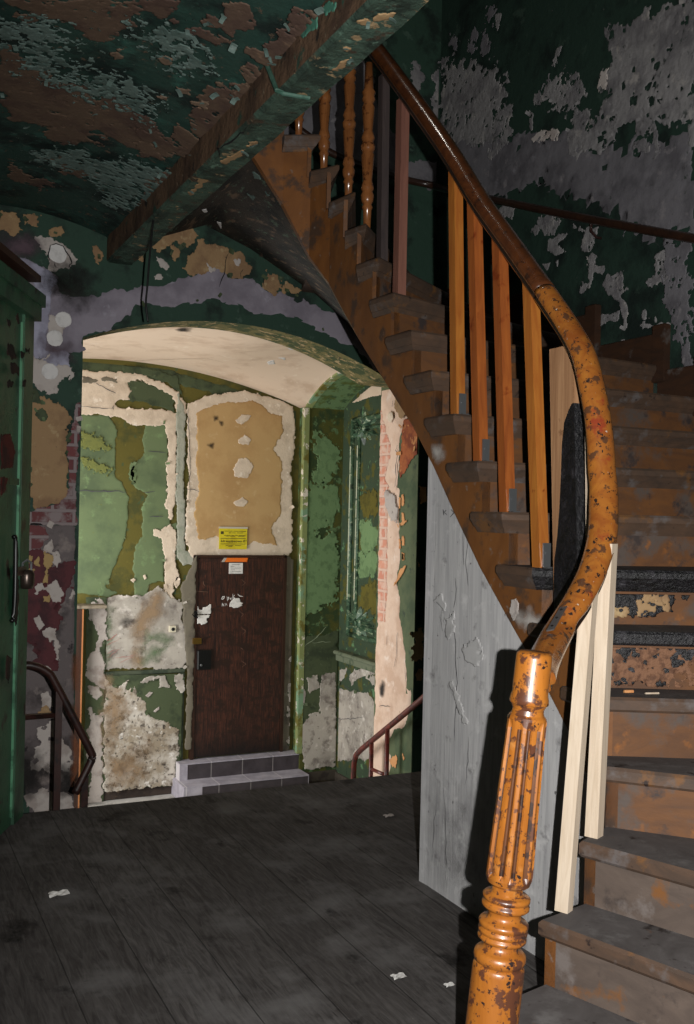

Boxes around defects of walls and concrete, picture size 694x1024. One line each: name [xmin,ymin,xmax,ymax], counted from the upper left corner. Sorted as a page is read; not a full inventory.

peeling [0,0,338,212]
peeling [410,0,694,367]
peeling [0,210,65,237]
peeling [92,245,104,265]
peeling [138,229,302,297]
peeling [419,486,427,504]
peeling [7,343,197,813]
flaking render [283,389,424,777]
peeling [614,594,671,618]
peeling [611,646,694,688]